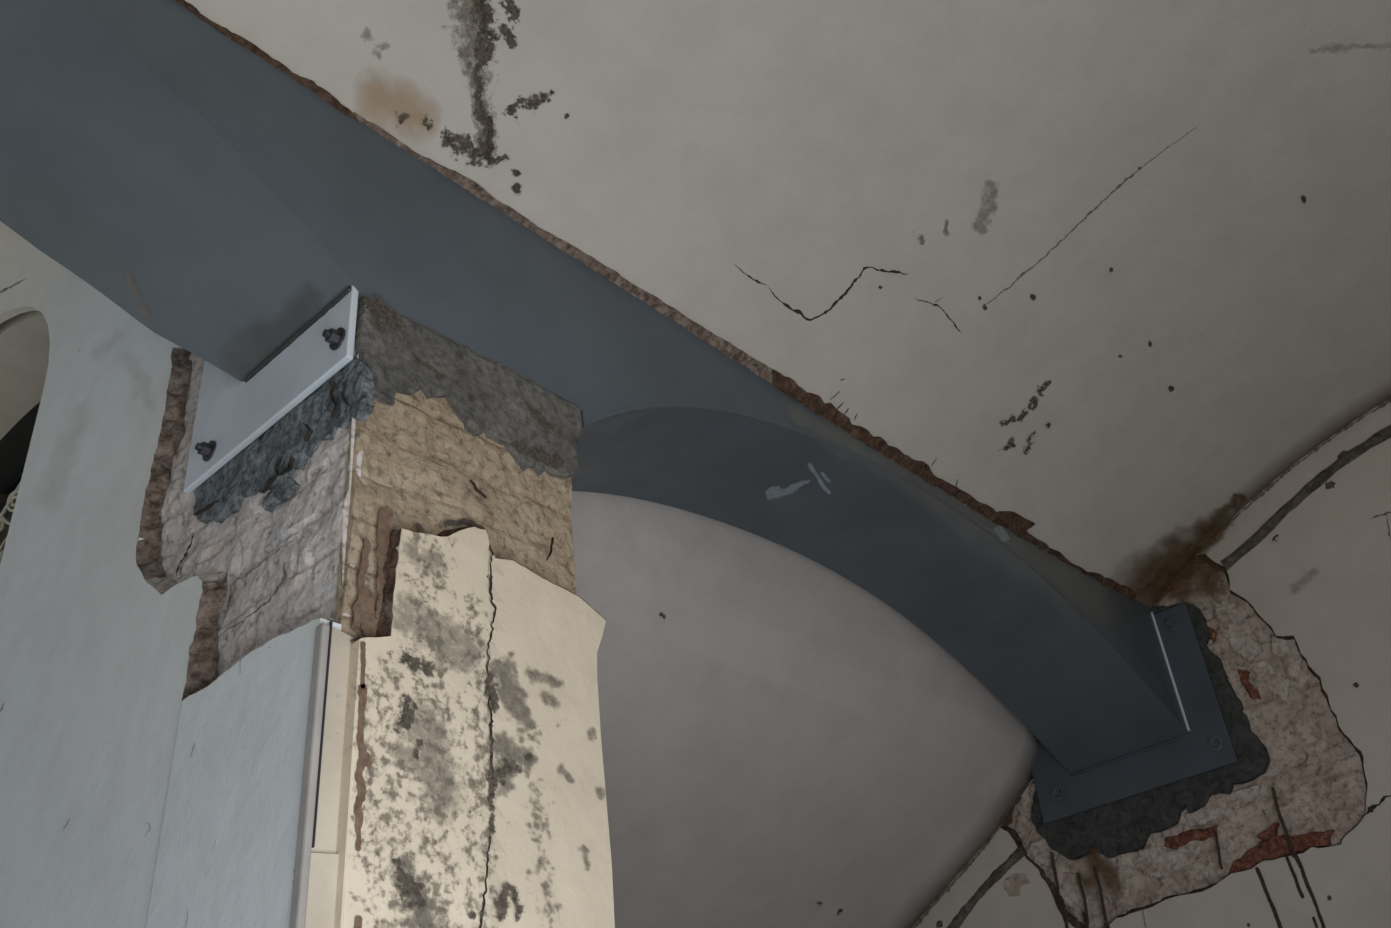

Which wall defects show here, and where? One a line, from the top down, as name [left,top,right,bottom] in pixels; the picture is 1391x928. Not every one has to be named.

water stain [395,0,554,194]
flaking render [173,0,1136,602]
crack [735,265,963,335]
crack [987,127,1197,304]
flaking render [136,348,606,851]
water stain [348,523,562,928]
crack [485,545,497,773]
flaking render [999,553,1368,928]
corrosion [1128,494,1246,606]
crack [479,837,491,928]
water stain [1255,867,1283,928]
water stain [1271,787,1331,928]